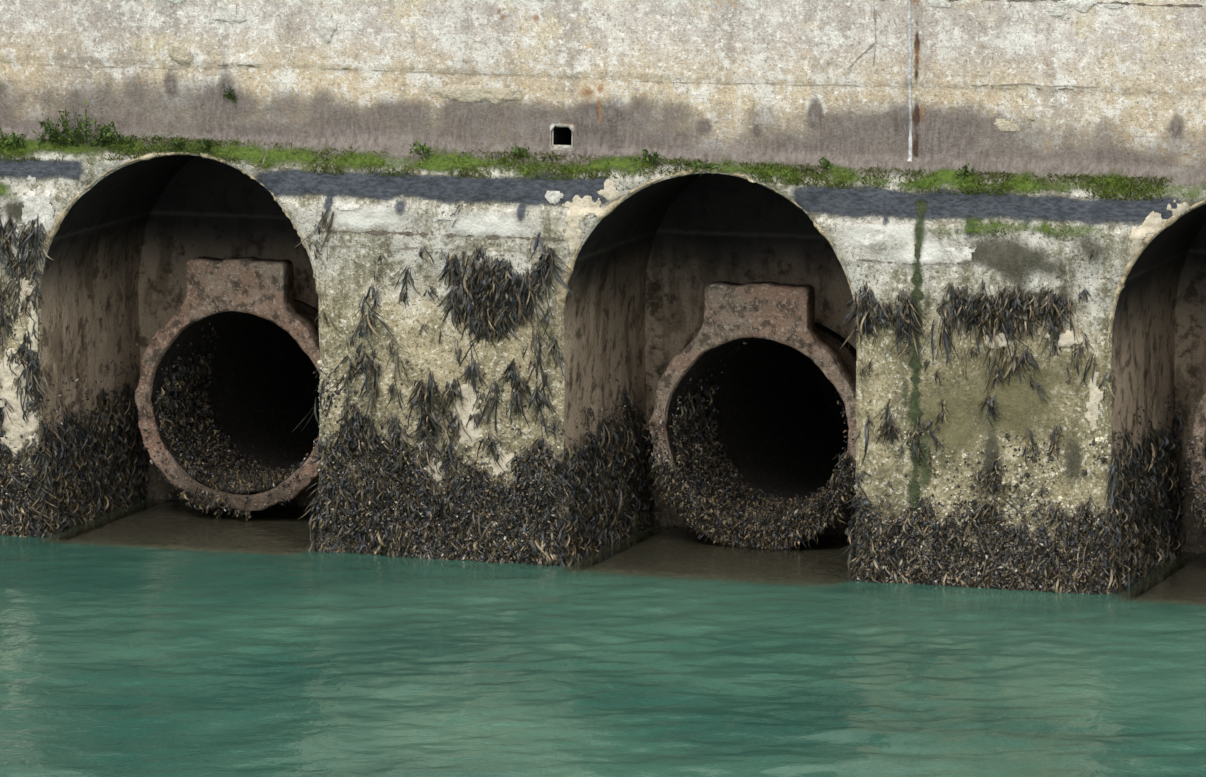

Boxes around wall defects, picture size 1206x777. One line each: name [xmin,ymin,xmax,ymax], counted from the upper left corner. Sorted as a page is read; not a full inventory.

damp [0,72,1206,377]
rust [913,104,924,157]